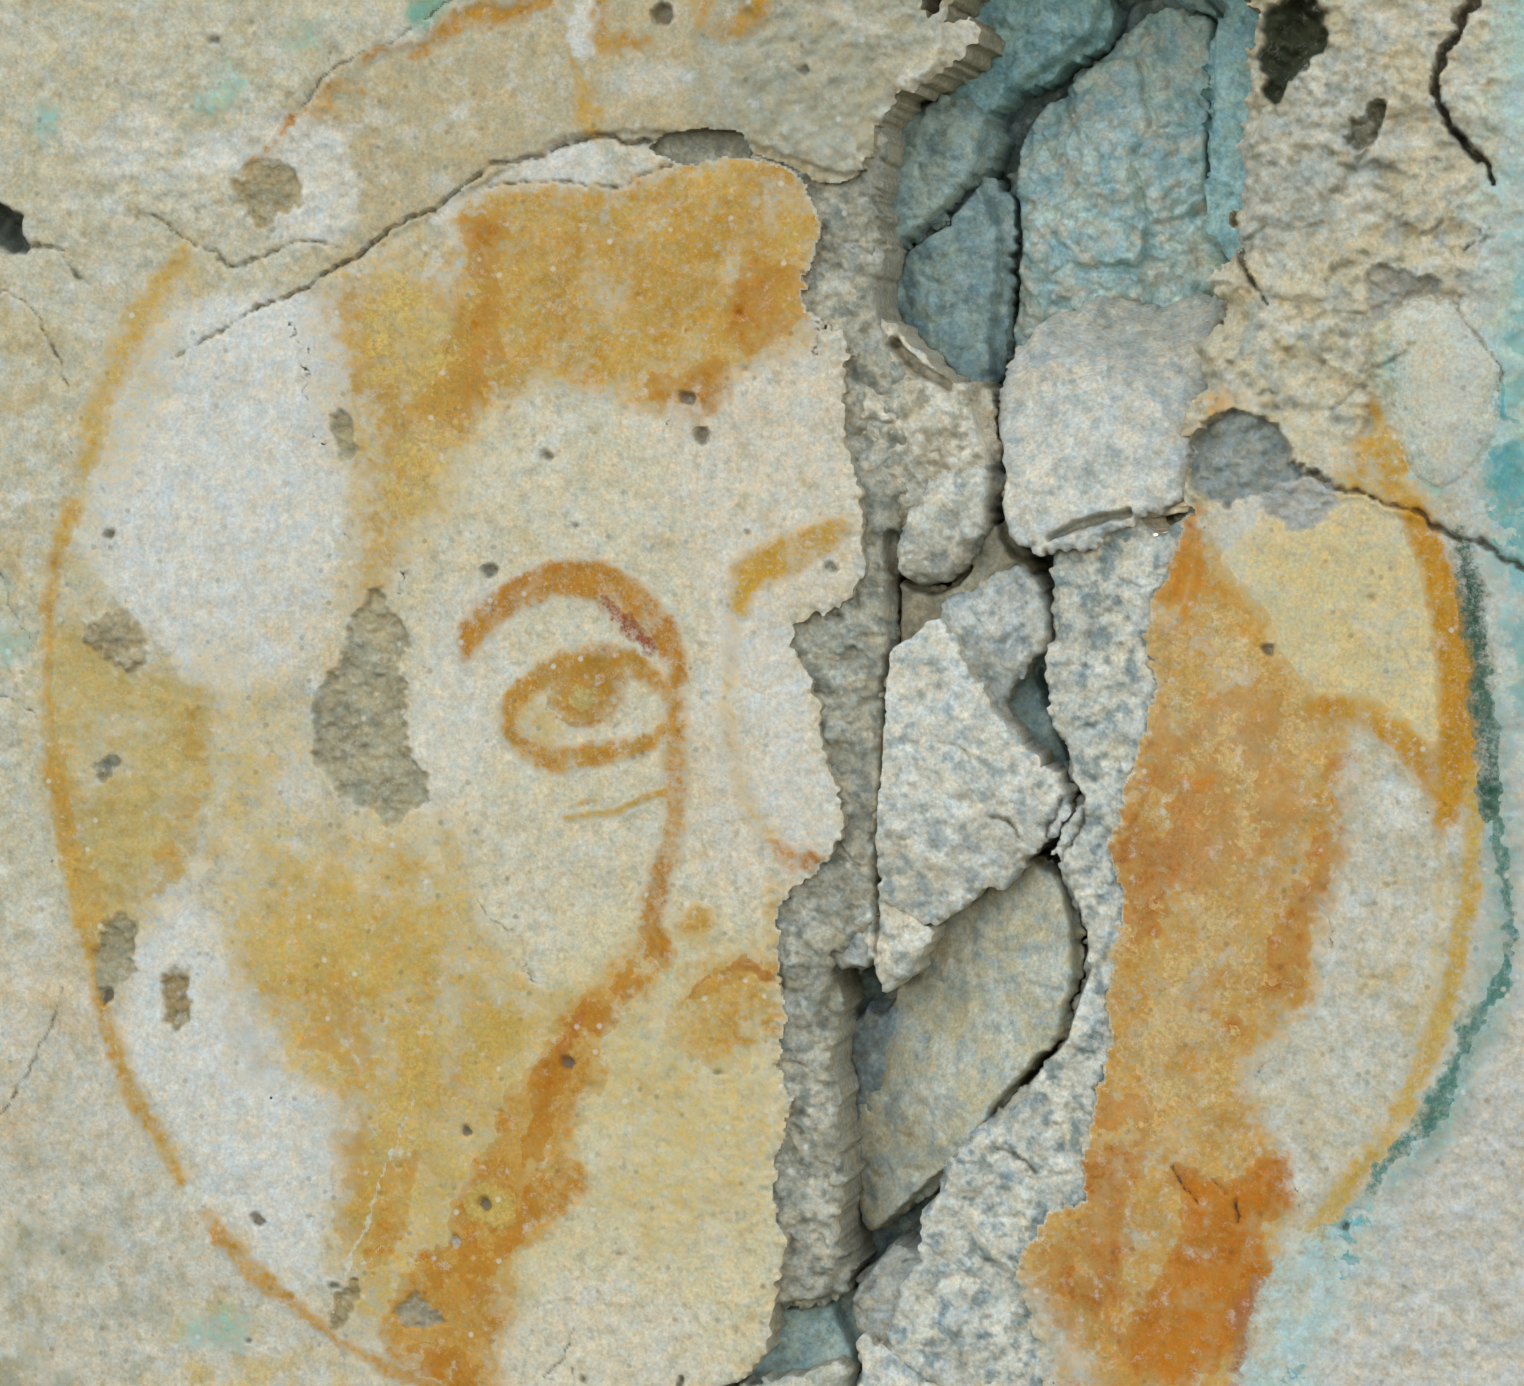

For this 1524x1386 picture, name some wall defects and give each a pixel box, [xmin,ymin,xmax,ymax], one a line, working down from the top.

crack [998,0,1218,185]
crack [1428,0,1496,186]
crack [1462,228,1484,254]
spalling [821,558,840,576]
crack [1311,472,1524,572]
spalling [82,604,149,671]
spalling [309,586,431,829]
crack [148,127,1195,1386]
spalling [94,913,139,1004]
spalling [158,963,196,1034]